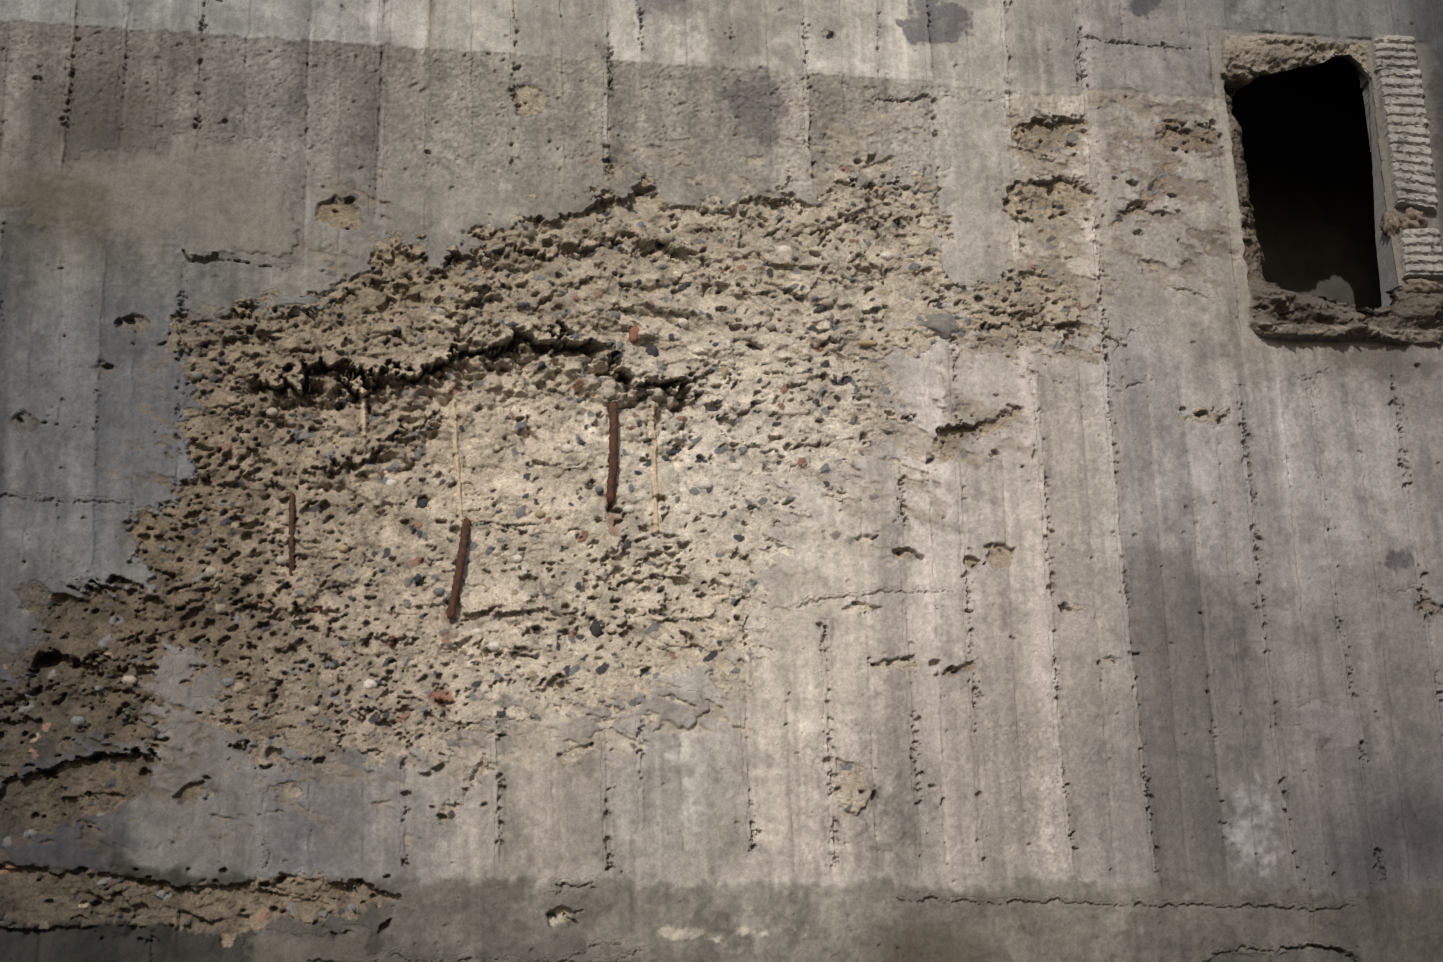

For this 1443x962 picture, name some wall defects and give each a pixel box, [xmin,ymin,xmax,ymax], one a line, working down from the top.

leakage [896,0,972,45]
spalling [1001,112,1099,223]
spalling [1104,117,1229,235]
spalling [0,155,1127,841]
corrosion [605,402,619,504]
corrosion [446,518,471,619]
spalling [0,861,402,948]
peeling [545,905,585,929]
crack [891,869,1367,962]